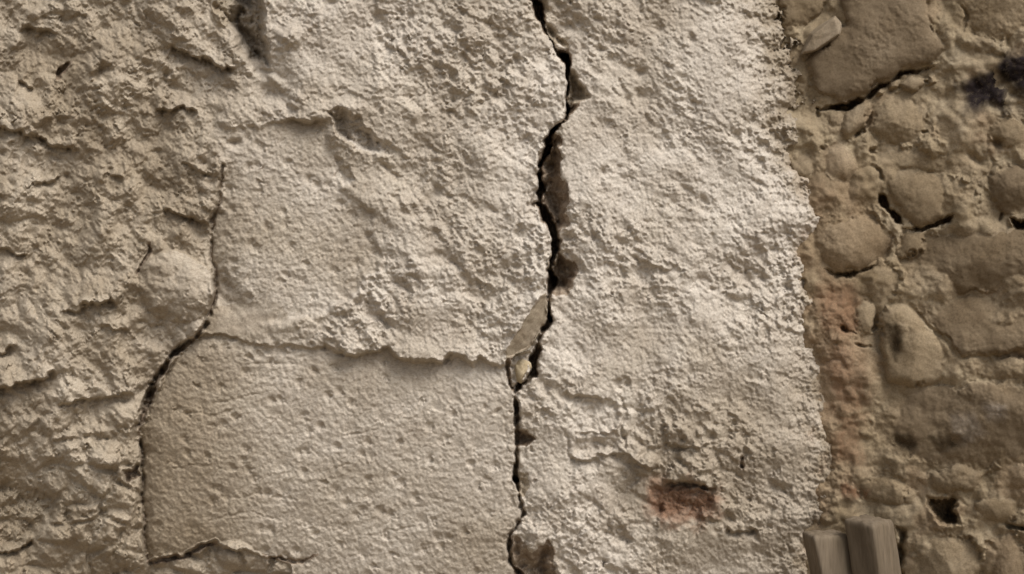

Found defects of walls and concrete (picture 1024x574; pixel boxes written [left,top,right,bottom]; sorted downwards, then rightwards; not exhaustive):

crack [136,165,224,564]
crack [262,553,319,564]
crack [505,0,591,574]